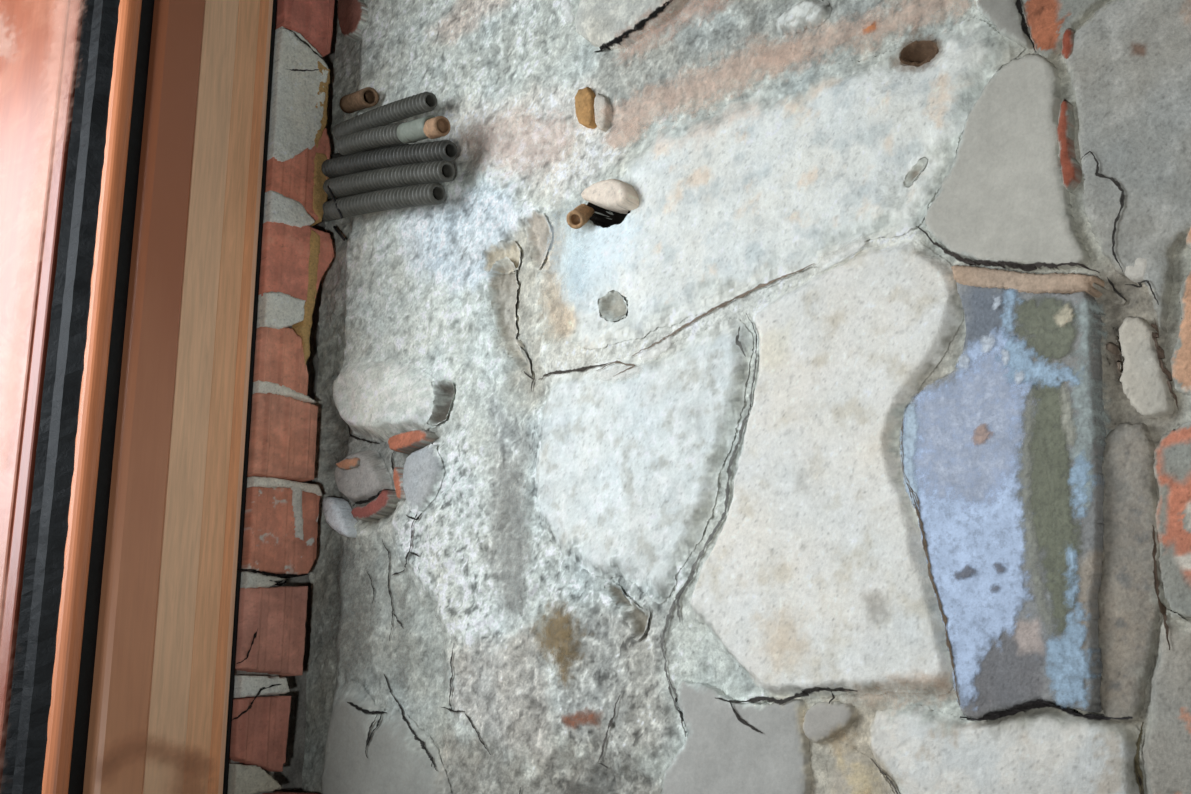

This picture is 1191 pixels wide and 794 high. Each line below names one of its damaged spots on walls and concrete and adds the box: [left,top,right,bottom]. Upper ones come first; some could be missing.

crack [595,0,674,52]
crack [1016,0,1036,52]
crack [901,419,1144,794]
crack [1152,525,1170,650]
crack [347,675,437,771]
crack [441,647,491,755]